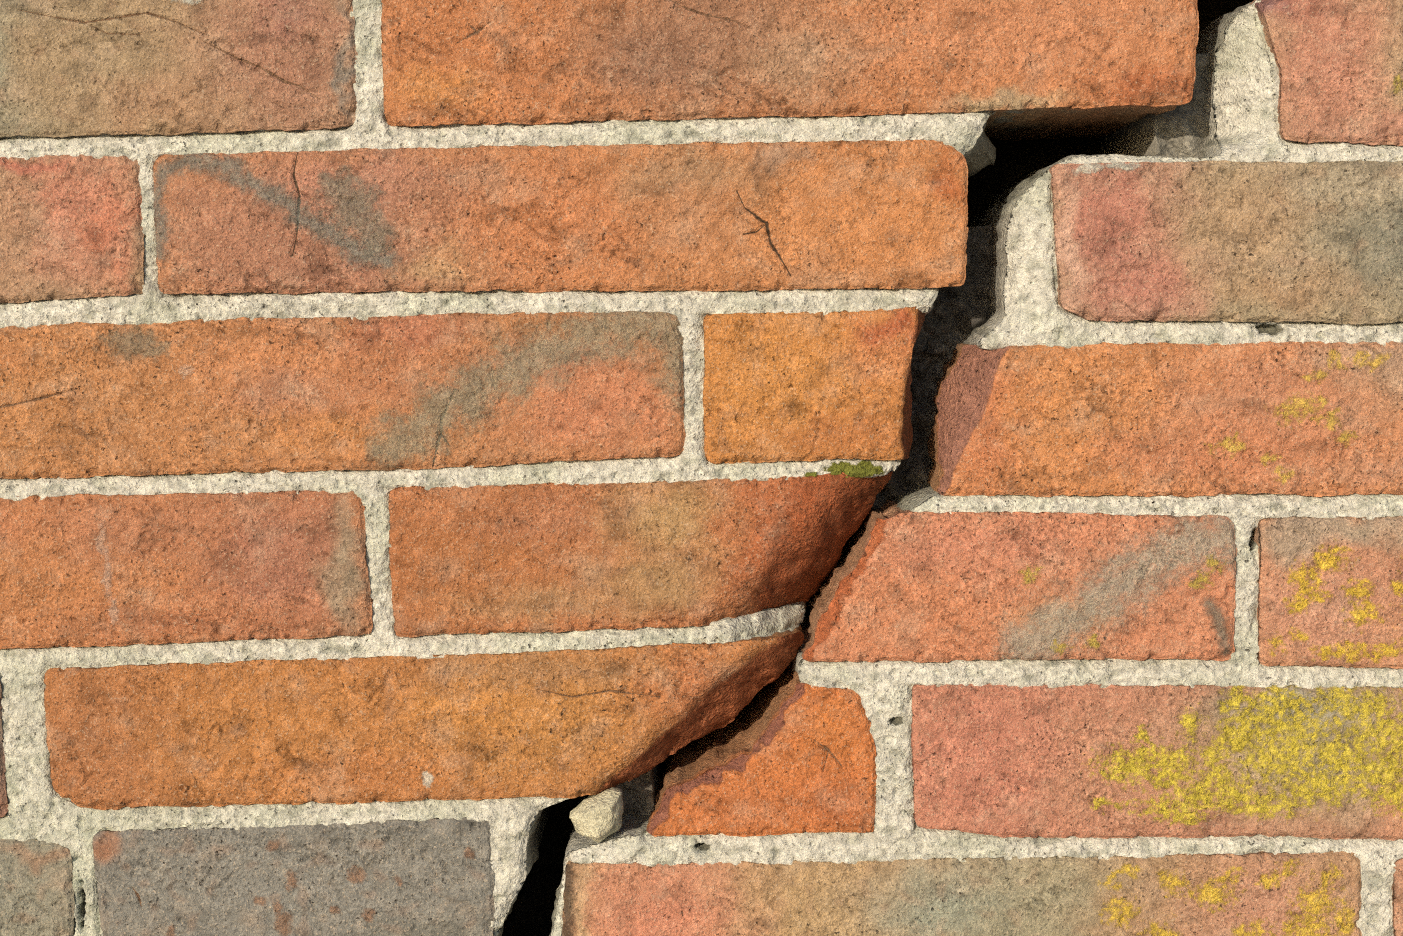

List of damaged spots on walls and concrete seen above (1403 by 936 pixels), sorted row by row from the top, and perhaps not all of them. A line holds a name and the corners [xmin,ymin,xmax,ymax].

crack [457,21,491,43]
crack [671,0,752,29]
crack [736,190,791,276]
crack [871,0,1254,510]
crack [539,689,660,698]
crack [616,755,671,818]
crack [814,739,843,771]
crack [502,796,582,936]